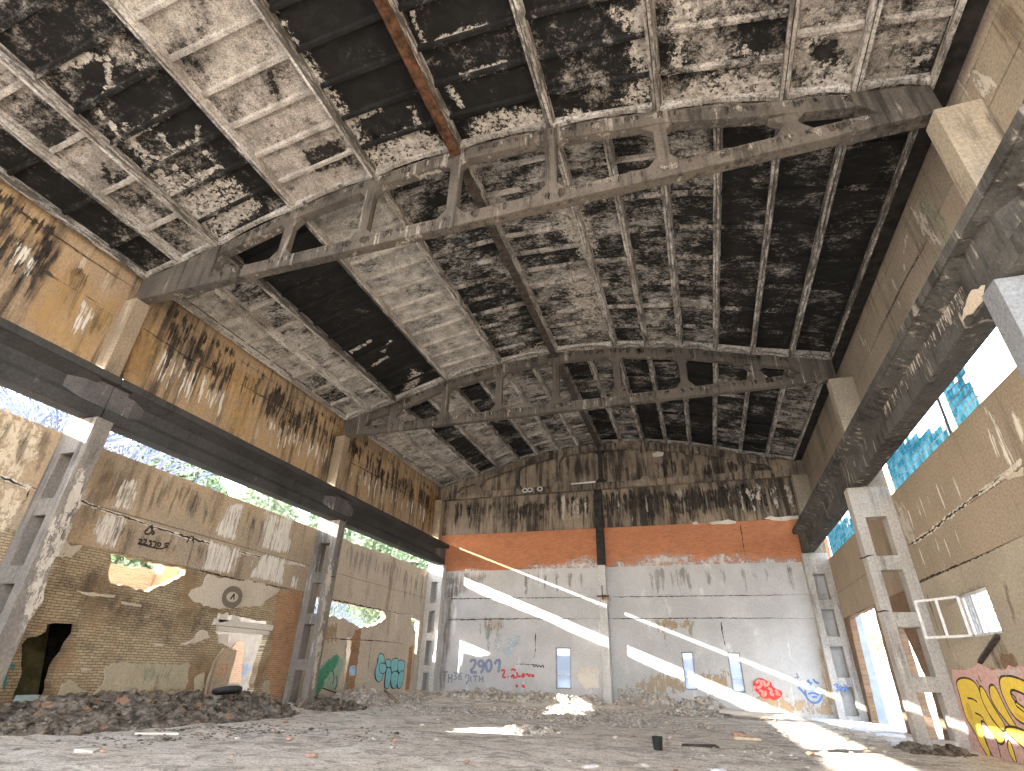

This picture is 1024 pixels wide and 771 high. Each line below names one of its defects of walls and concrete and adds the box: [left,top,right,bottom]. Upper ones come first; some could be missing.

peeling [59,52,116,99]
peeling [95,107,263,238]
damp [0,190,118,352]
damp [128,306,336,463]
peeling [77,591,142,607]
peeling [58,661,205,695]
crack [81,499,305,589]
damp [189,502,298,589]
spalling [188,574,303,699]
damp [455,458,795,527]
crack [920,543,1006,582]
crack [910,458,1022,547]